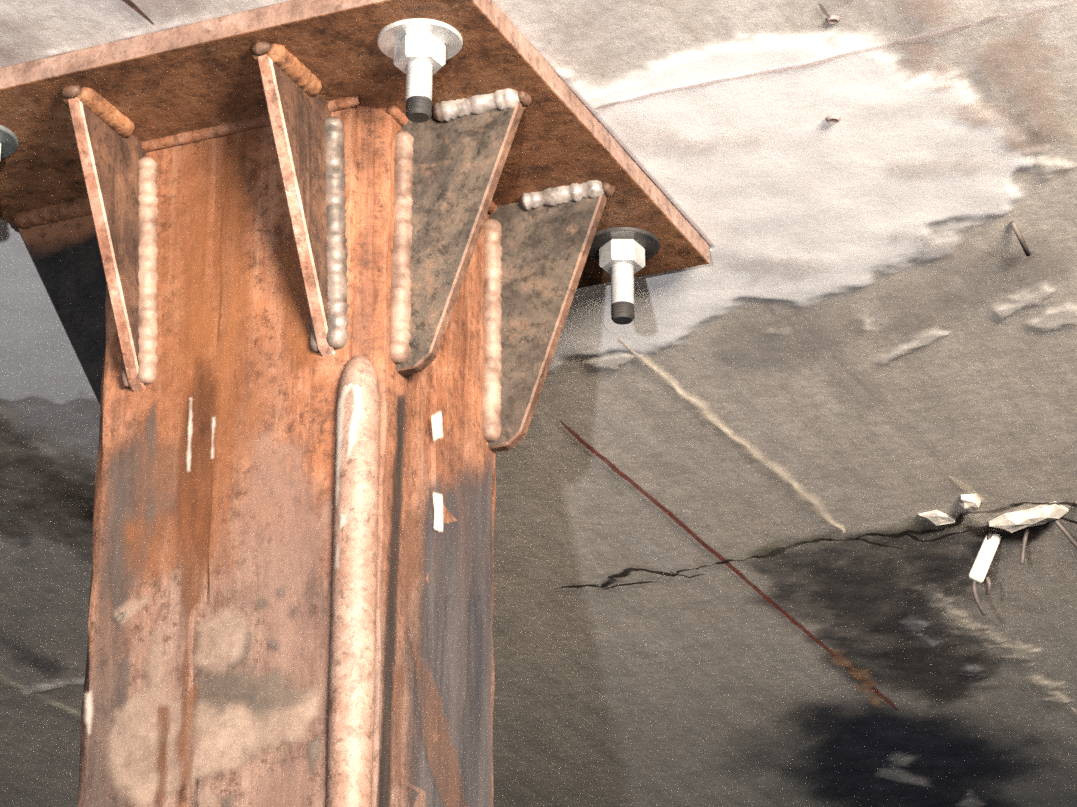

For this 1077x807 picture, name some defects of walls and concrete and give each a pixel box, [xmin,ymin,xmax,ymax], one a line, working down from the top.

damp [0,406,95,558]
rust [180,363,215,605]
crack [554,502,1077,590]
damp [753,519,1041,700]
spalling [958,494,982,510]
spalling [918,501,1069,542]
rust [179,674,190,807]
damp [1030,677,1074,710]